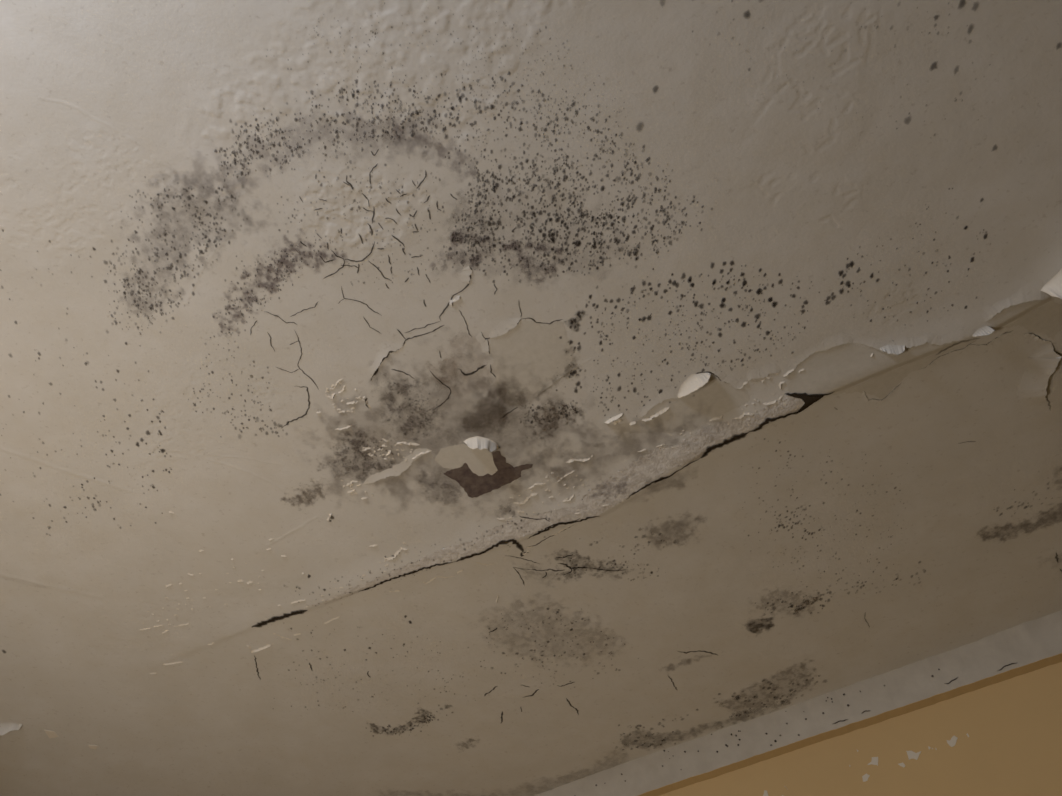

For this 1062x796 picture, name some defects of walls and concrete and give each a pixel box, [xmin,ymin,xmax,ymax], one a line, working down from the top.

damp [312,72,687,281]
damp [228,236,326,316]
crack [250,149,497,427]
crack [517,306,563,324]
damp [560,261,808,364]
damp [826,258,879,304]
peeling [364,340,404,379]
peeling [474,317,592,406]
peeling [604,268,1062,452]
spalling [341,436,593,520]
damp [749,603,773,633]
peeling [0,722,22,736]